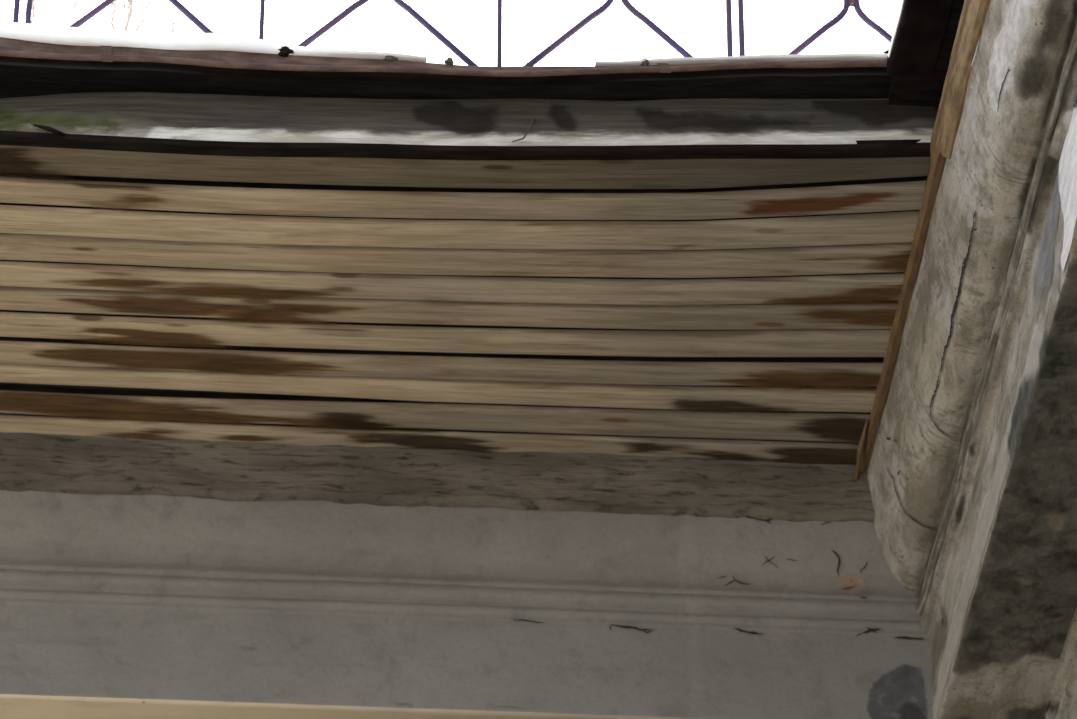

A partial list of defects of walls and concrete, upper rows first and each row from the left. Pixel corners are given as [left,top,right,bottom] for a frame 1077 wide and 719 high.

leakage [413,101,496,134]
leakage [637,108,808,132]
peeling [1069,219,1077,256]
leakage [33,328,333,375]
leakage [64,272,363,331]
leakage [768,285,902,327]
crack [930,210,977,441]
leakage [952,0,1077,674]
leakage [714,371,881,391]
leakage [0,393,500,453]
leakage [624,418,870,465]
crack [885,466,938,532]